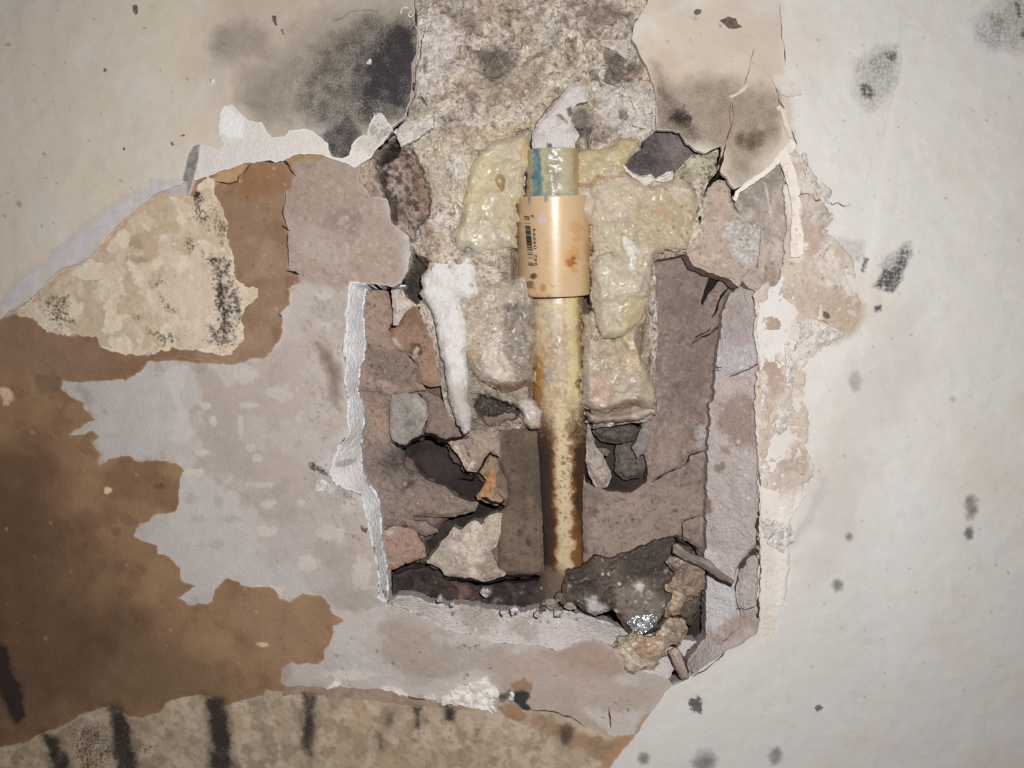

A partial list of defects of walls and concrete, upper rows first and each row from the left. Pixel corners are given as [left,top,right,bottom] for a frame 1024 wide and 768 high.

hole [720,17,742,29]
mould [301,17,418,158]
mould [659,88,698,139]
mould [736,130,765,150]
mould [208,257,242,345]
spalling [641,172,708,383]
peeling [0,0,672,768]
spalling [731,74,861,643]
water stain [0,646,25,722]
water stain [44,706,146,768]
water stain [206,698,233,768]
water stain [303,693,316,755]